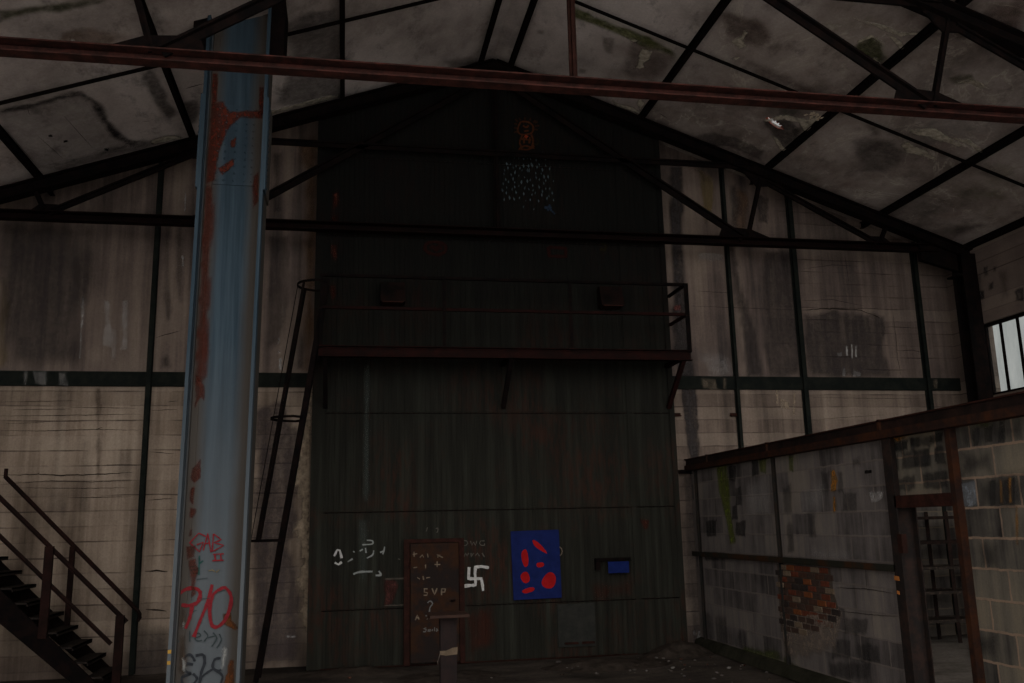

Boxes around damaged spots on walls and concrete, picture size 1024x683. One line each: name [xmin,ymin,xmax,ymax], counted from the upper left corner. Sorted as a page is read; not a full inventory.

water stain [4,92,136,145]
corrosion [195,74,264,406]
water stain [733,253,888,376]
flaking render [775,564,841,636]